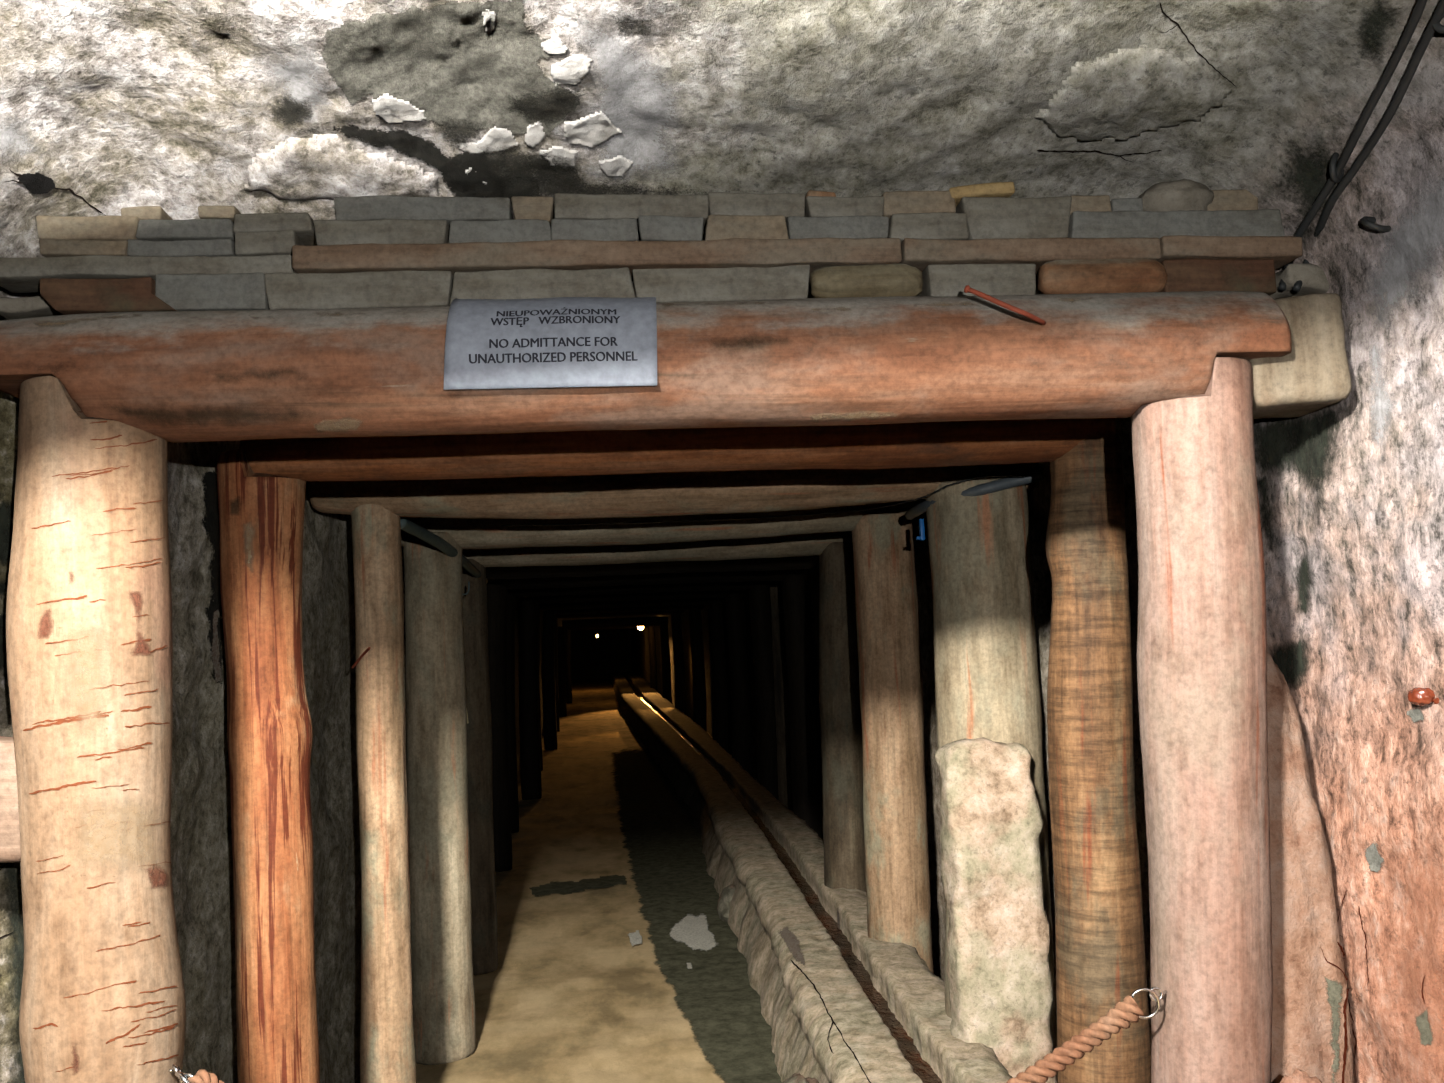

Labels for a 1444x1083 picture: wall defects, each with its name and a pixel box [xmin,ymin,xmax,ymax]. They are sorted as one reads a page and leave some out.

crack [1160,3,1235,86]
peeling [321,0,633,185]
crack [1037,149,1162,162]